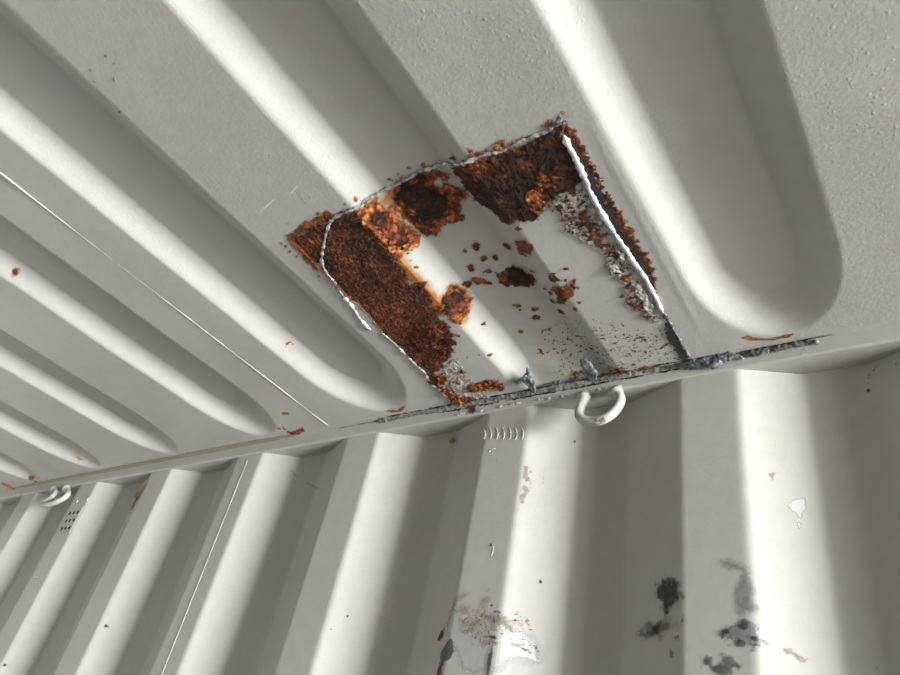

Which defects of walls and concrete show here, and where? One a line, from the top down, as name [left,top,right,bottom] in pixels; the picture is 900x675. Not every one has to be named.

rust [280,111,680,391]
peeling [549,184,662,323]
rust [742,334,830,351]
peeling [437,607,539,675]